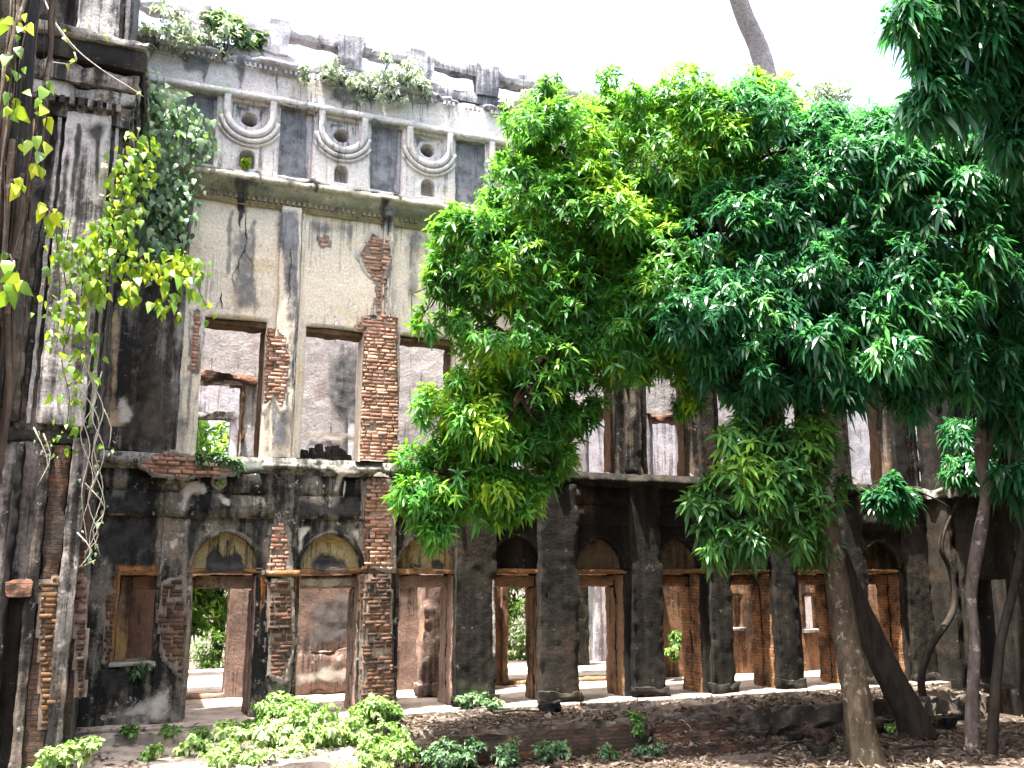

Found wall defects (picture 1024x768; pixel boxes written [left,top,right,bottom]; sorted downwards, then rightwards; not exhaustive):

water stain [186,93,262,306]
crack [217,214,255,309]
water stain [123,257,192,452]
spalling [187,307,205,373]
water stain [271,211,299,447]
spalling [138,449,237,510]
spalling [261,230,399,700]
water stain [206,540,245,572]
water stain [312,539,347,572]
spalling [35,576,64,730]
spalling [155,575,191,677]